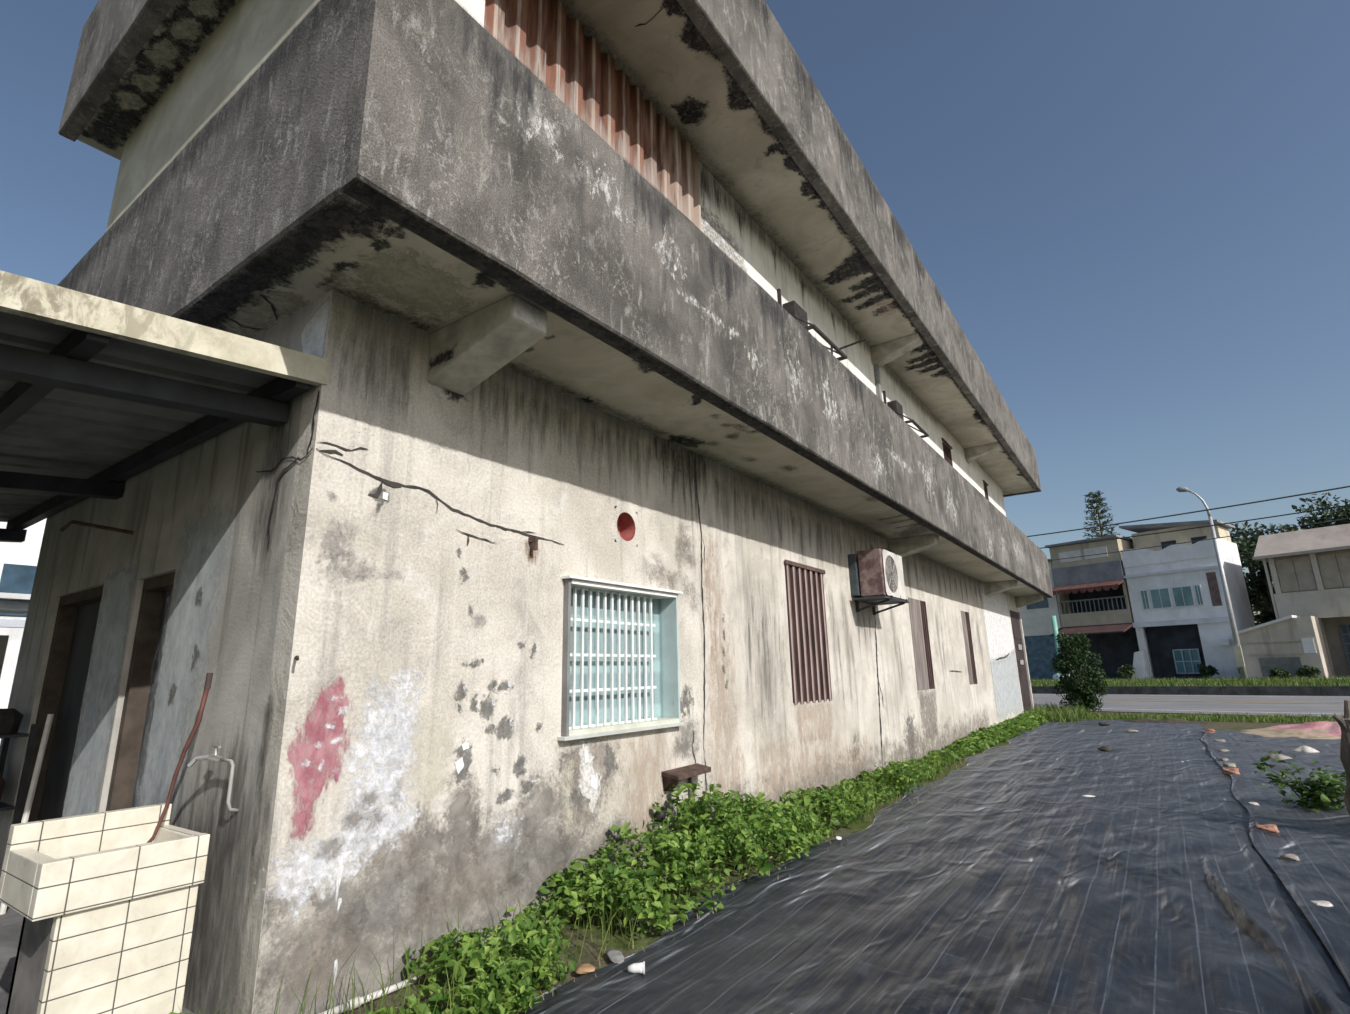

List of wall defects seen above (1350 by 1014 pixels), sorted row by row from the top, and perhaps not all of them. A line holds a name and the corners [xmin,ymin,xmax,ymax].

mould [59,0,339,288]
crack [256,390,564,550]
damp [178,155,1052,598]
peeling [267,669,424,921]
damp [169,685,698,1014]
peeling [454,742,472,783]
spalling [455,680,515,739]
spalling [493,755,535,804]
crack [692,462,707,789]
damp [706,573,989,826]